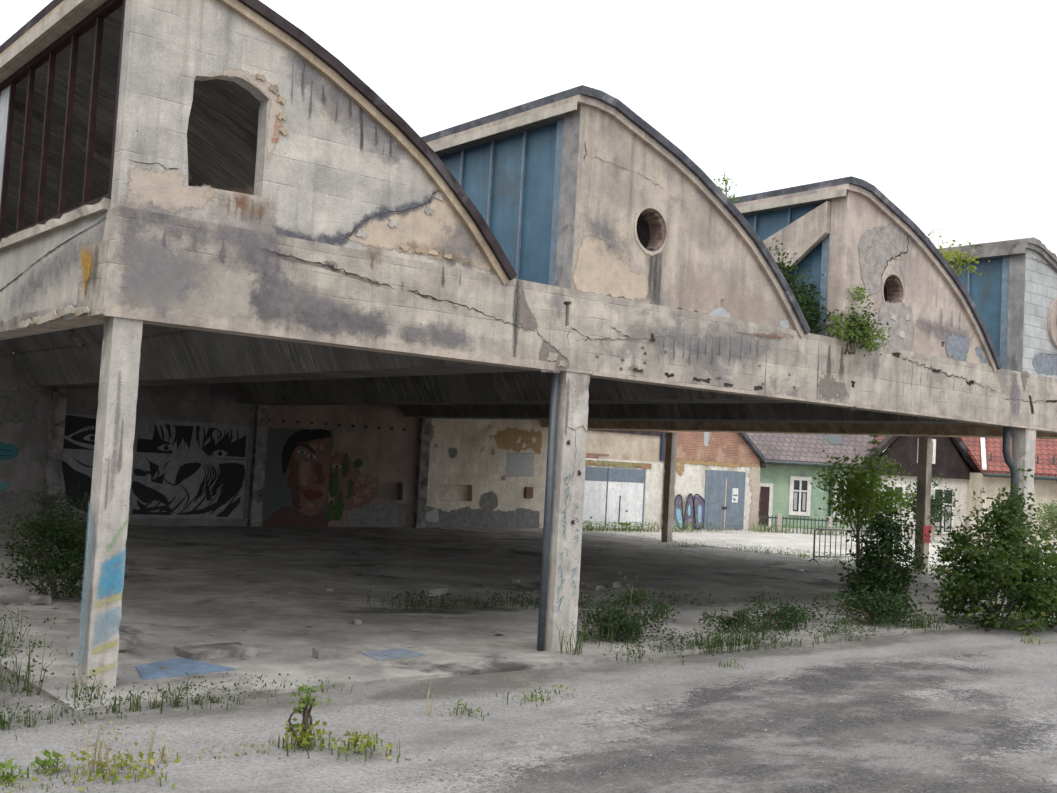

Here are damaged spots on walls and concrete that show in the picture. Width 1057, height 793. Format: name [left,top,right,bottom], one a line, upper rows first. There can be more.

flaking render [210,69,288,162]
water stain [292,60,400,161]
rust [81,249,92,295]
water stain [123,204,385,337]
crack [259,248,533,331]
flaking render [573,236,651,301]
flaking render [858,223,915,352]
spalling [537,331,569,374]
water stain [657,325,771,362]
crack [893,352,1057,414]
peeling [480,425,542,455]